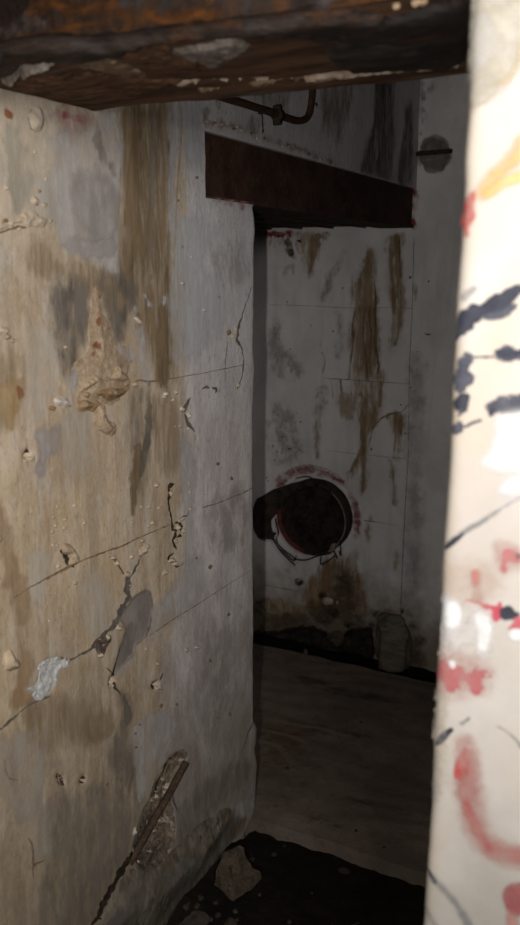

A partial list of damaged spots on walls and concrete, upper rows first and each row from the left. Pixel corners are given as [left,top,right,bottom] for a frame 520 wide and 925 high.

rust [145,11,213,24]
damp [0,70,432,456]
damp [339,251,403,493]
damp [130,394,176,515]
crack [68,479,192,710]
crack [0,696,51,730]
spalling [28,656,71,701]
spalling [132,712,187,870]